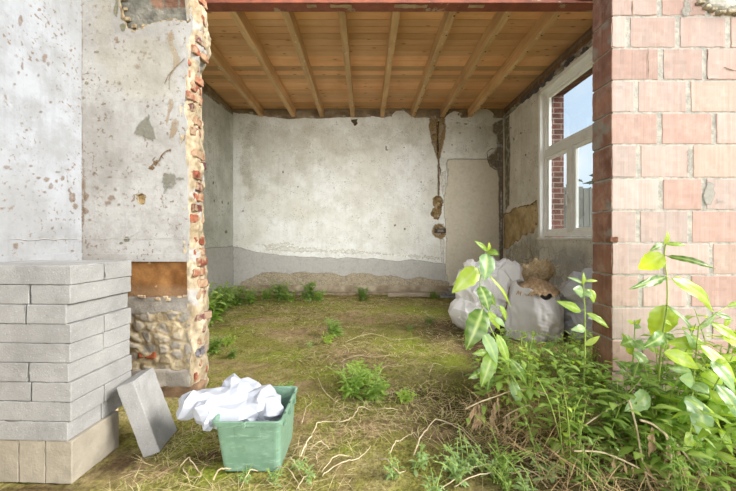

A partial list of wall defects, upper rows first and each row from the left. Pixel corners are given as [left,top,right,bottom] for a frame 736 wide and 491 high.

flaking render [696,0,736,16]
spalling [119,0,468,398]
flaking render [503,200,538,249]